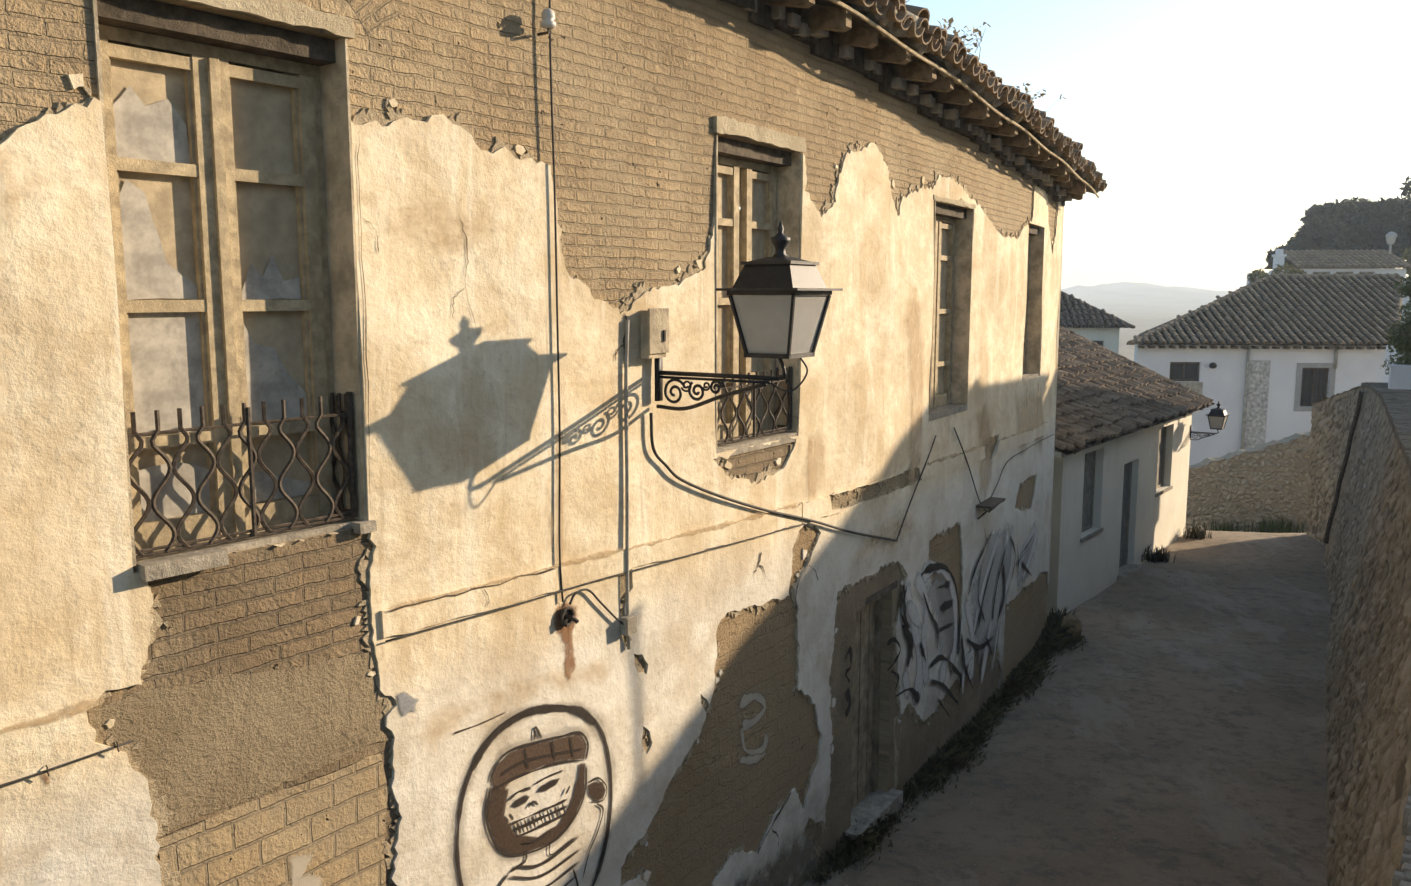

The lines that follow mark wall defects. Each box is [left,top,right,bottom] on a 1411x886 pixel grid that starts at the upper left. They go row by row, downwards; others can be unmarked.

flaking render [0,0,98,144]
flaking render [227,11,329,35]
flaking render [292,0,1057,313]
flaking render [714,442,794,484]
flaking render [87,529,401,886]
rust [554,603,576,679]
flaking render [619,523,1048,886]